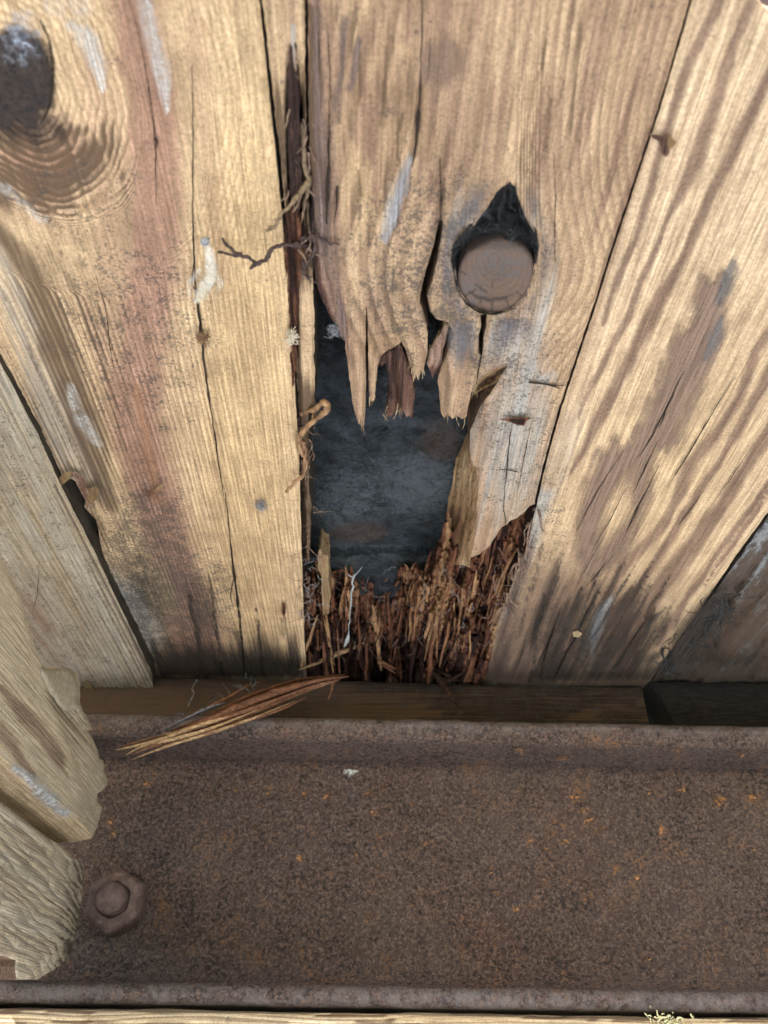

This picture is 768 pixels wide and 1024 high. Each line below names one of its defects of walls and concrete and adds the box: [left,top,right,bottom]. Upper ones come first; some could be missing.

crack [551,154,559,262]
crack [192,64,246,678]
peeling [501,417,531,426]